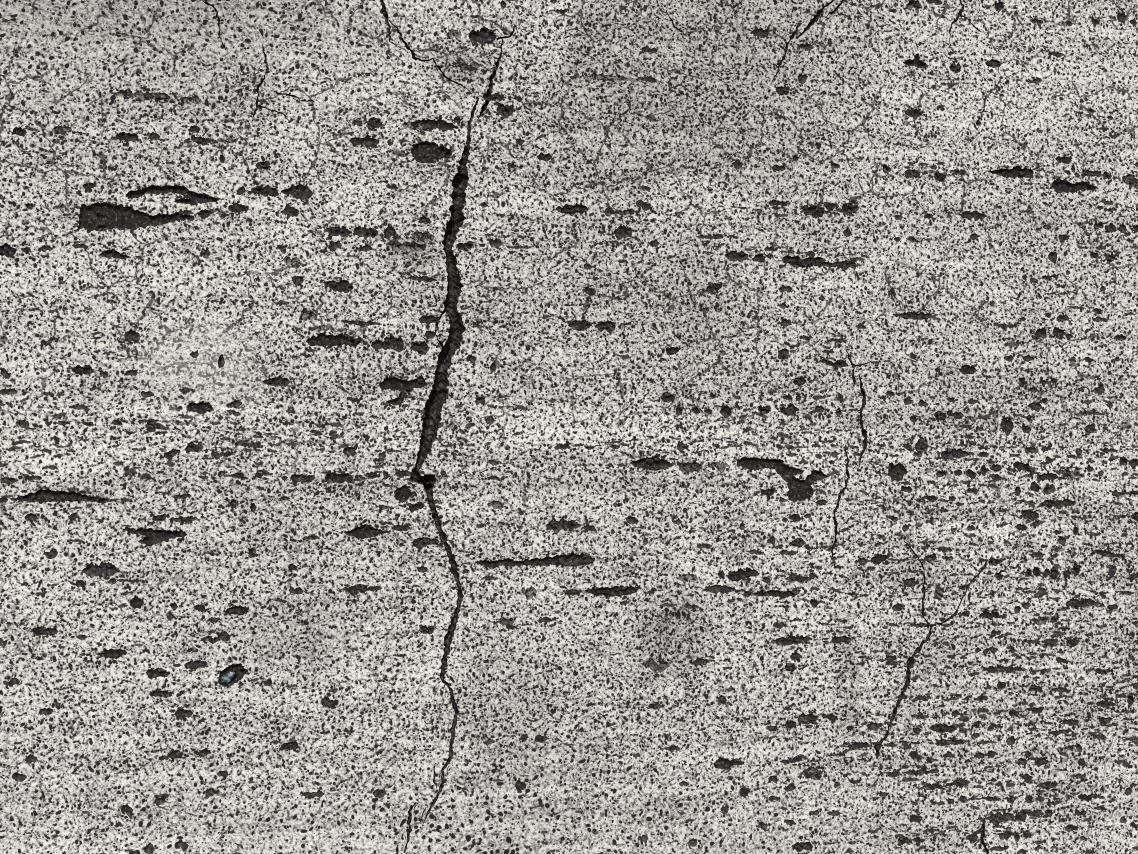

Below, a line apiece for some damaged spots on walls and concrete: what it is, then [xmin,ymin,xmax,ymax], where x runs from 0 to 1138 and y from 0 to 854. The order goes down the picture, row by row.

crack [772,0,844,81]
crack [380,0,521,854]
crack [832,345,870,573]
crack [874,540,1011,759]
crack [980,811,989,854]